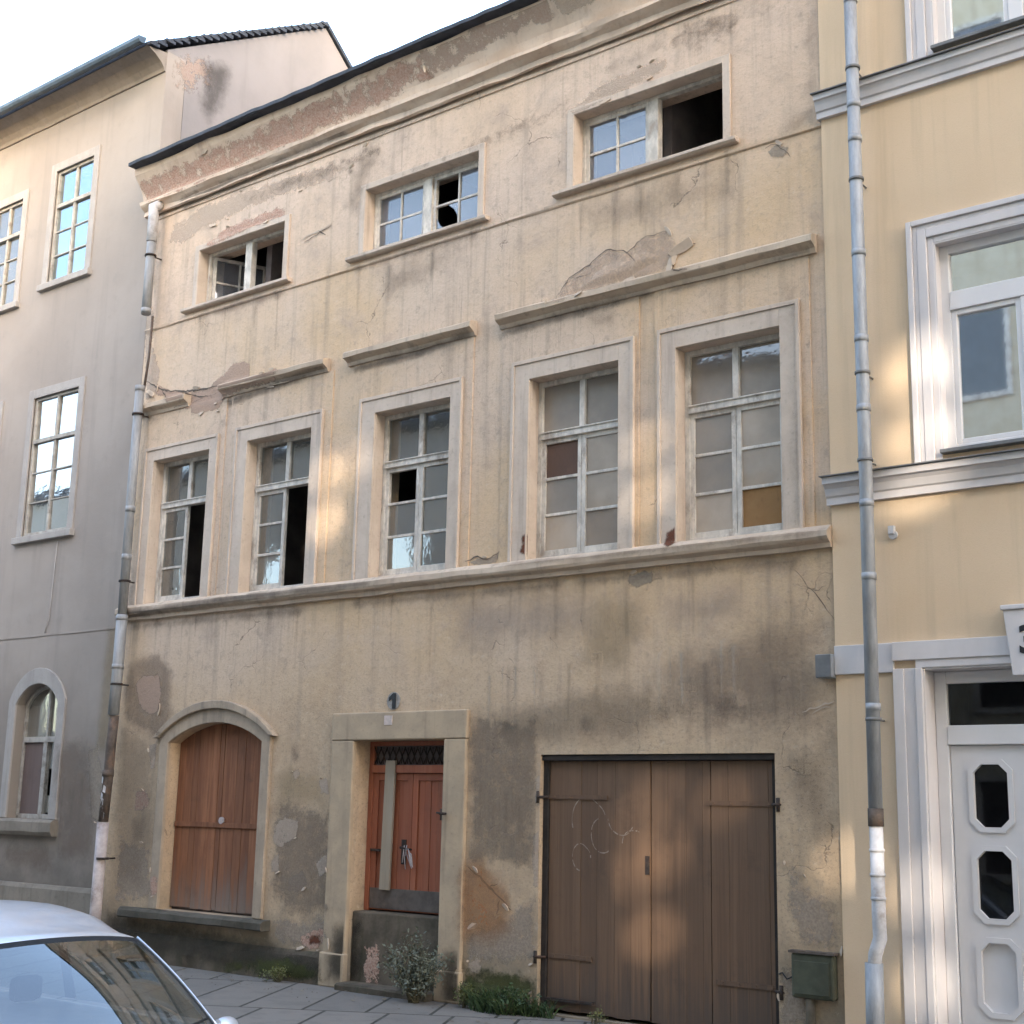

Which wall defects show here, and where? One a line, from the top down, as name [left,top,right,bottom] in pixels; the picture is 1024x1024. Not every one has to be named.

flaking render [140,0,593,202]
peeling [145,308,276,416]
peeling [136,674,161,716]
leakage [472,719,535,862]